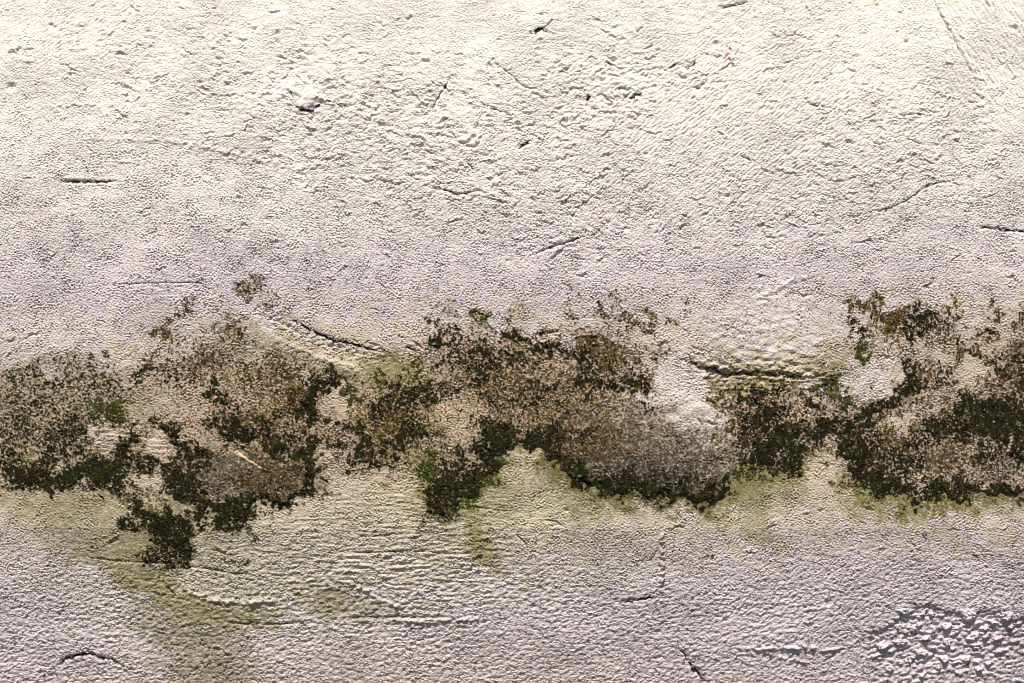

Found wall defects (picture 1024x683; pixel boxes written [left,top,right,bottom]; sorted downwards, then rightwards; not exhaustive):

crack [65,178,117,186]
leakage [232,272,279,311]
crack [293,320,417,352]
crack [683,351,820,383]
leakage [0,284,1024,532]
leakage [118,544,190,578]